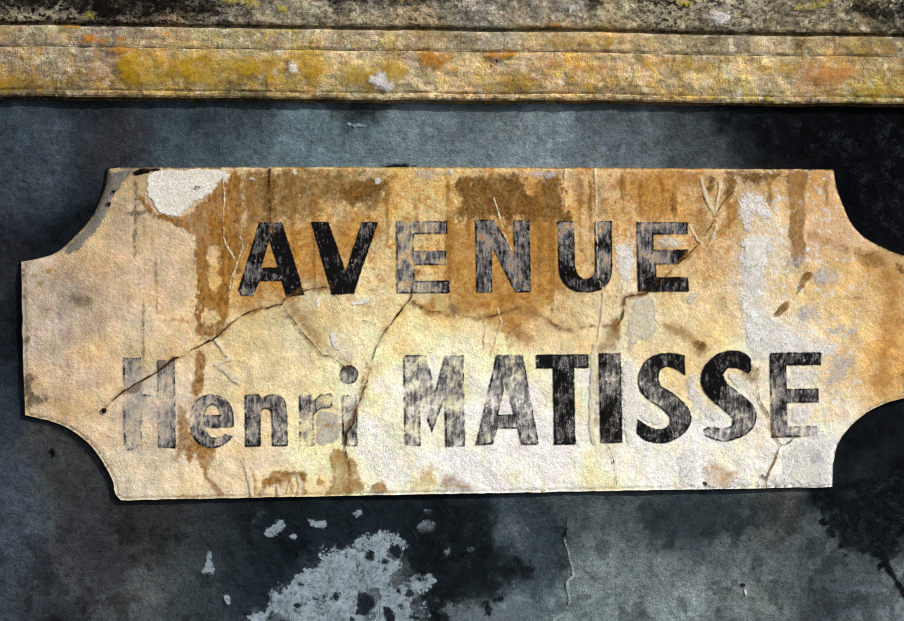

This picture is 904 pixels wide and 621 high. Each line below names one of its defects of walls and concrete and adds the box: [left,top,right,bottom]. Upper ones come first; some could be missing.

peeling [66,168,229,253]
rust [136,171,253,336]
rust [444,171,593,292]
rust [716,170,809,265]
crack [108,285,347,405]
crack [345,283,520,475]
crack [757,385,794,480]
peeling [202,552,214,574]
rust [253,470,307,495]
peeling [264,520,297,539]
peeling [247,529,437,621]
damp [808,470,904,596]